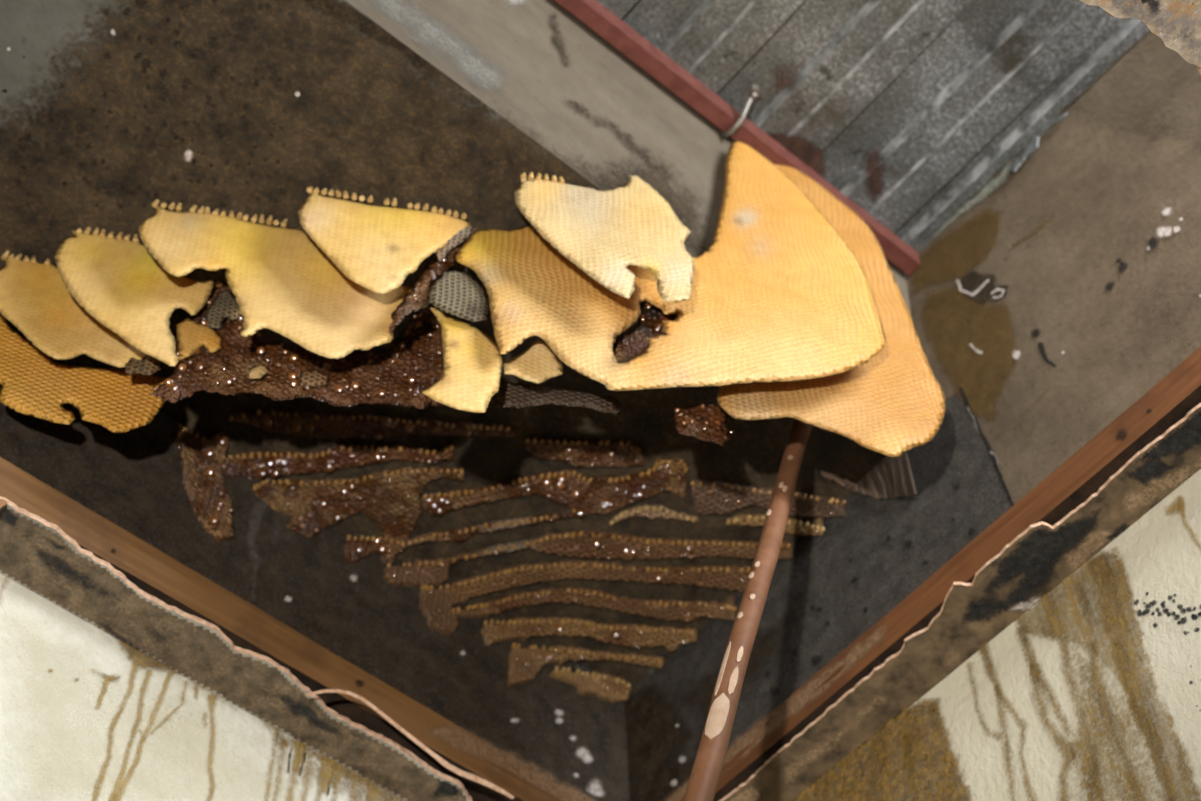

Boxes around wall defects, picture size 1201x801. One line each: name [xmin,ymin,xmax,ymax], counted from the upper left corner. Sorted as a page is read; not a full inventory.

water stain [0,0,709,268]
spalling [1105,258,1127,290]
water stain [0,252,796,801]
water stain [728,210,1016,749]
water stain [786,695,971,801]
water stain [961,412,1201,801]